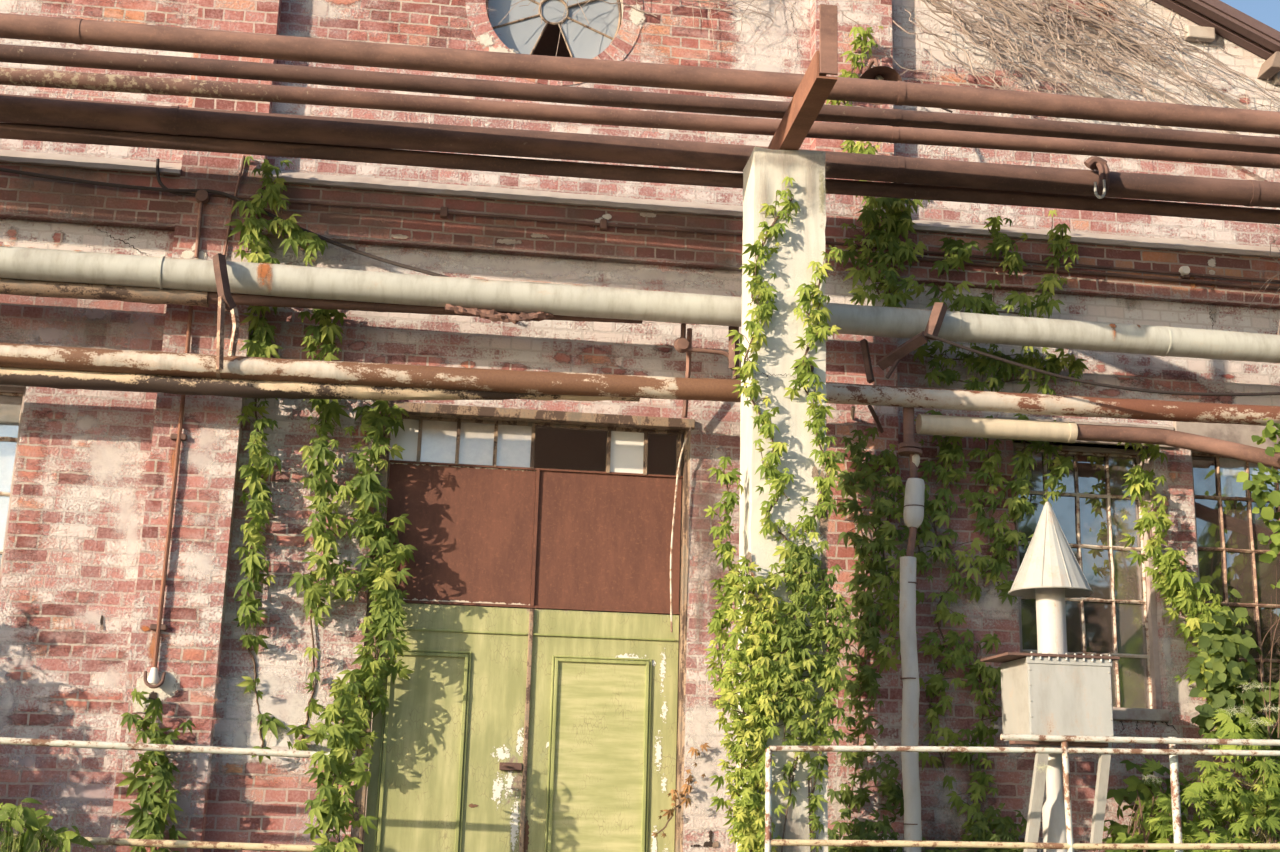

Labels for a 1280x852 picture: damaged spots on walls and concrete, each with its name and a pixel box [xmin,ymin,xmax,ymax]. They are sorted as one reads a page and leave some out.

peeling [43,0,196,27]
rust [257,263,272,288]
peeling [8,411,96,571]
peeling [140,454,163,491]
peeling [166,490,224,571]
peeling [6,591,157,726]
peeling [160,607,218,744]
peeling [616,652,668,793]
peeling [491,728,524,851]